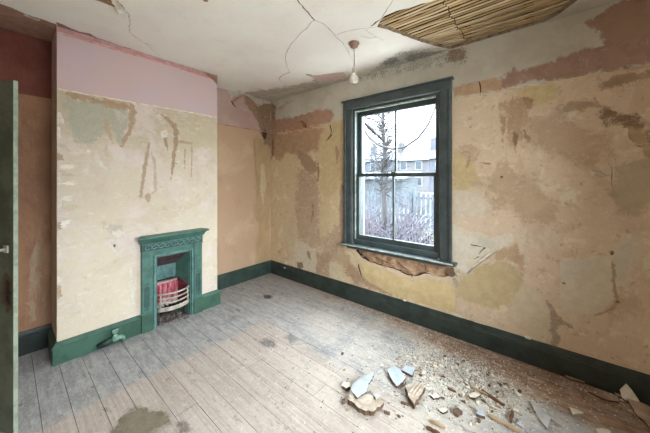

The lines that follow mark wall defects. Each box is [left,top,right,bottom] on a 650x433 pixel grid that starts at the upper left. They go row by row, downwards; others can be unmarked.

crack [279,0,393,82]
water stain [357,47,470,84]
flaking render [377,0,577,49]
peeling [453,0,650,110]
peeling [256,100,343,238]
peeling [356,144,526,287]